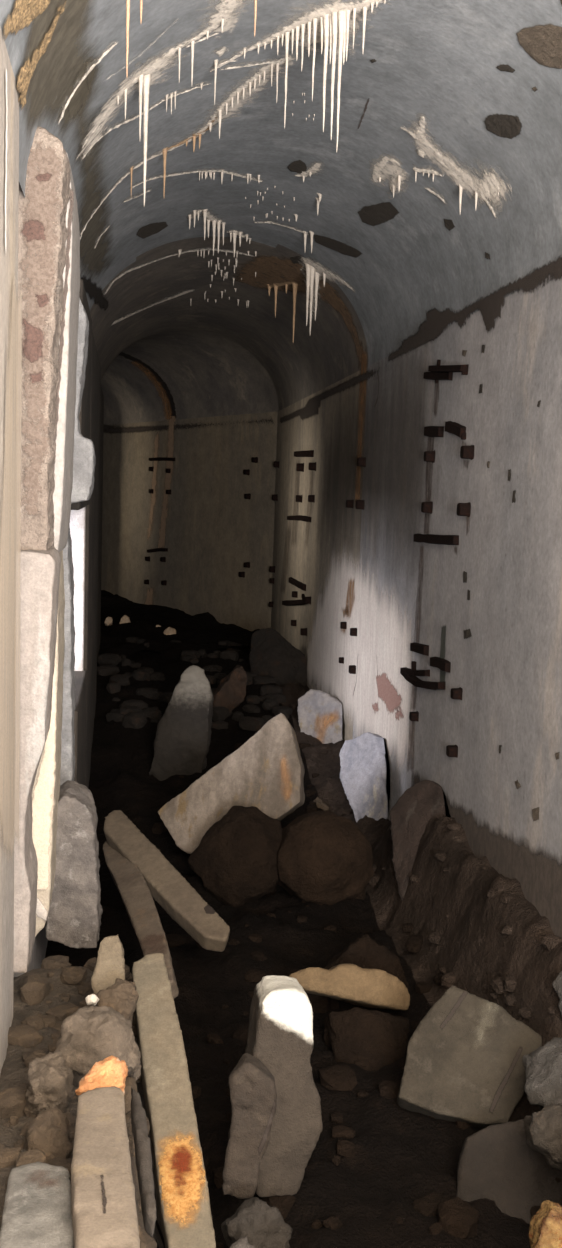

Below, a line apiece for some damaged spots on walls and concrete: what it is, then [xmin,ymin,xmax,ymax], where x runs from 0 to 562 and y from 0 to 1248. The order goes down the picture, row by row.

spalling [516,24,562,69]
spalling [484,114,522,139]
damp [24,0,386,342]
damp [371,114,511,218]
spalling [358,202,399,226]
rust [234,256,367,501]
rust [343,581,355,632]
peeling [372,673,404,720]